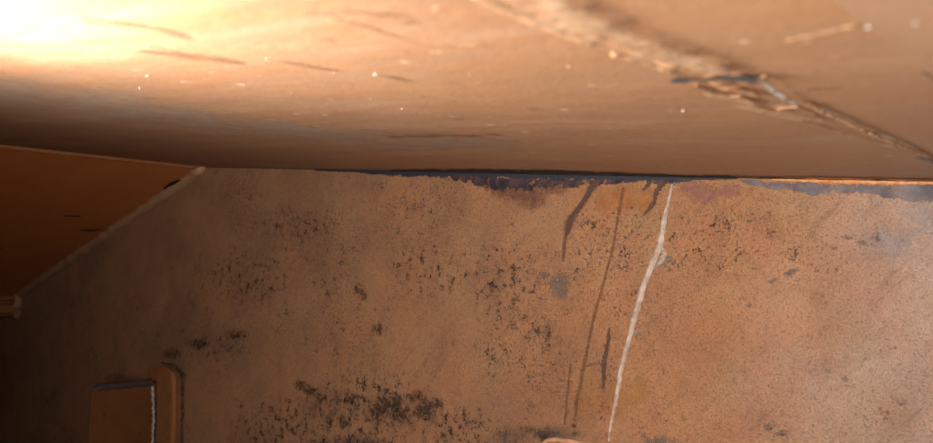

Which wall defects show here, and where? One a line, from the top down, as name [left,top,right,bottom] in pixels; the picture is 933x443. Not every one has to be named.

crack [670,72,826,122]
corrosion [564,188,624,435]